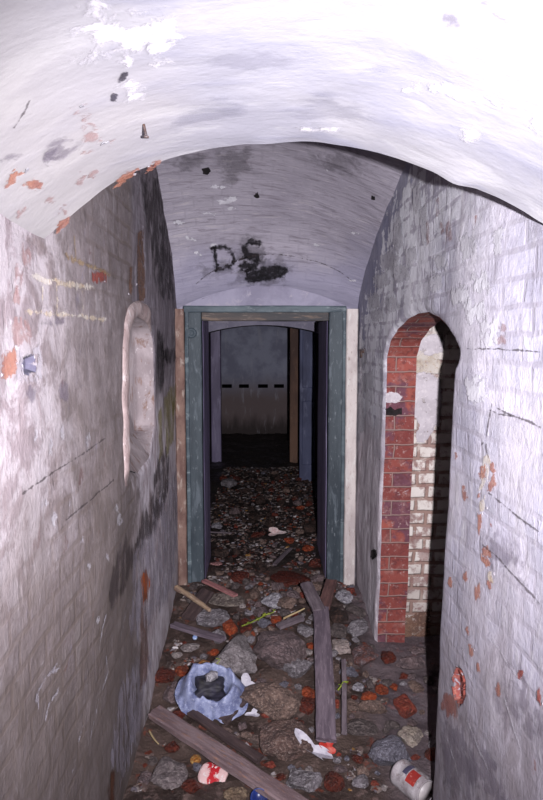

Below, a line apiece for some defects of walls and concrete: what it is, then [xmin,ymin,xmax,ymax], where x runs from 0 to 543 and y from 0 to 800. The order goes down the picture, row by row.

peeling [6,168,43,189]
peeling [114,160,161,187]
peeling [56,217,70,234]
flaking render [1,345,37,380]
spalling [385,407,402,416]
crack [482,405,541,457]
crack [23,439,104,494]
crack [66,479,114,520]
spalling [477,455,497,536]
spalling [474,545,495,600]
spalling [451,667,466,704]